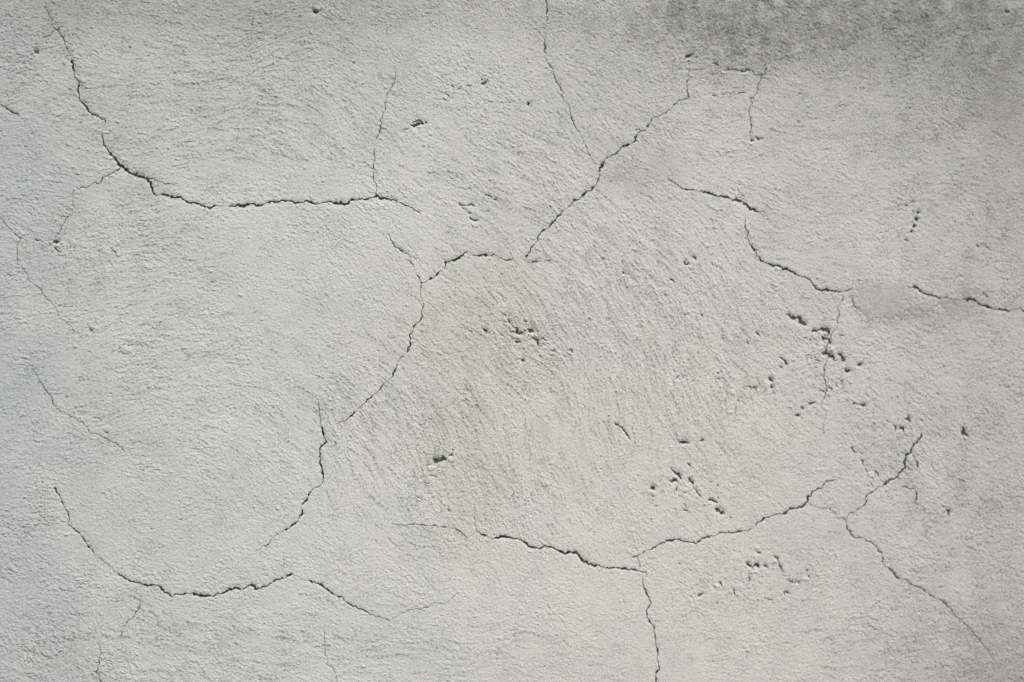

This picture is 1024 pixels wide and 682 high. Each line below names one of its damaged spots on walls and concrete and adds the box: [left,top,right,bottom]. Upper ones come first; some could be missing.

crack [748,67,767,136]
crack [1,218,76,332]
crack [33,0,690,682]
crack [667,178,869,432]
crack [908,285,1024,312]
crack [392,432,996,682]